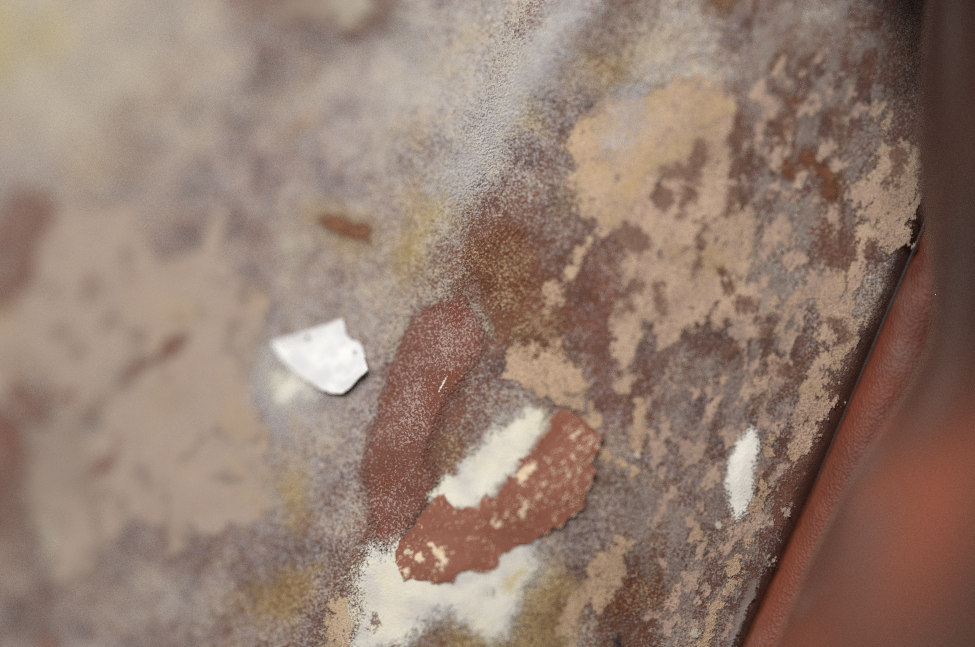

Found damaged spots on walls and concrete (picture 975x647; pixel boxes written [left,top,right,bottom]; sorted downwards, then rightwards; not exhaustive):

peeling [0,198,368,566]
peeling [317,45,921,647]